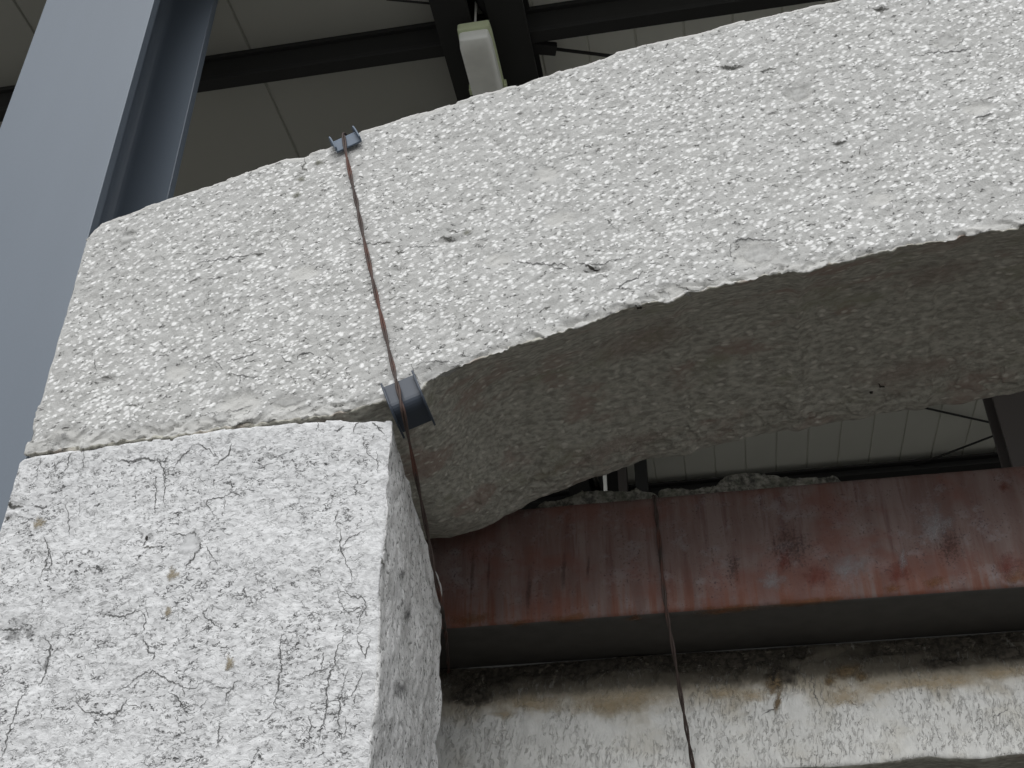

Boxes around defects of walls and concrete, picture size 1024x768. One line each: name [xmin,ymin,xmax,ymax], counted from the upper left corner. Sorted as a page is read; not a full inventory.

crack [116,444,232,511]
crack [315,422,385,495]
crack [40,503,80,580]
crack [171,488,240,569]
crack [72,607,238,747]
crack [259,509,371,743]
leakage [439,645,815,711]
leakage [856,631,1024,686]
crack [0,691,25,758]